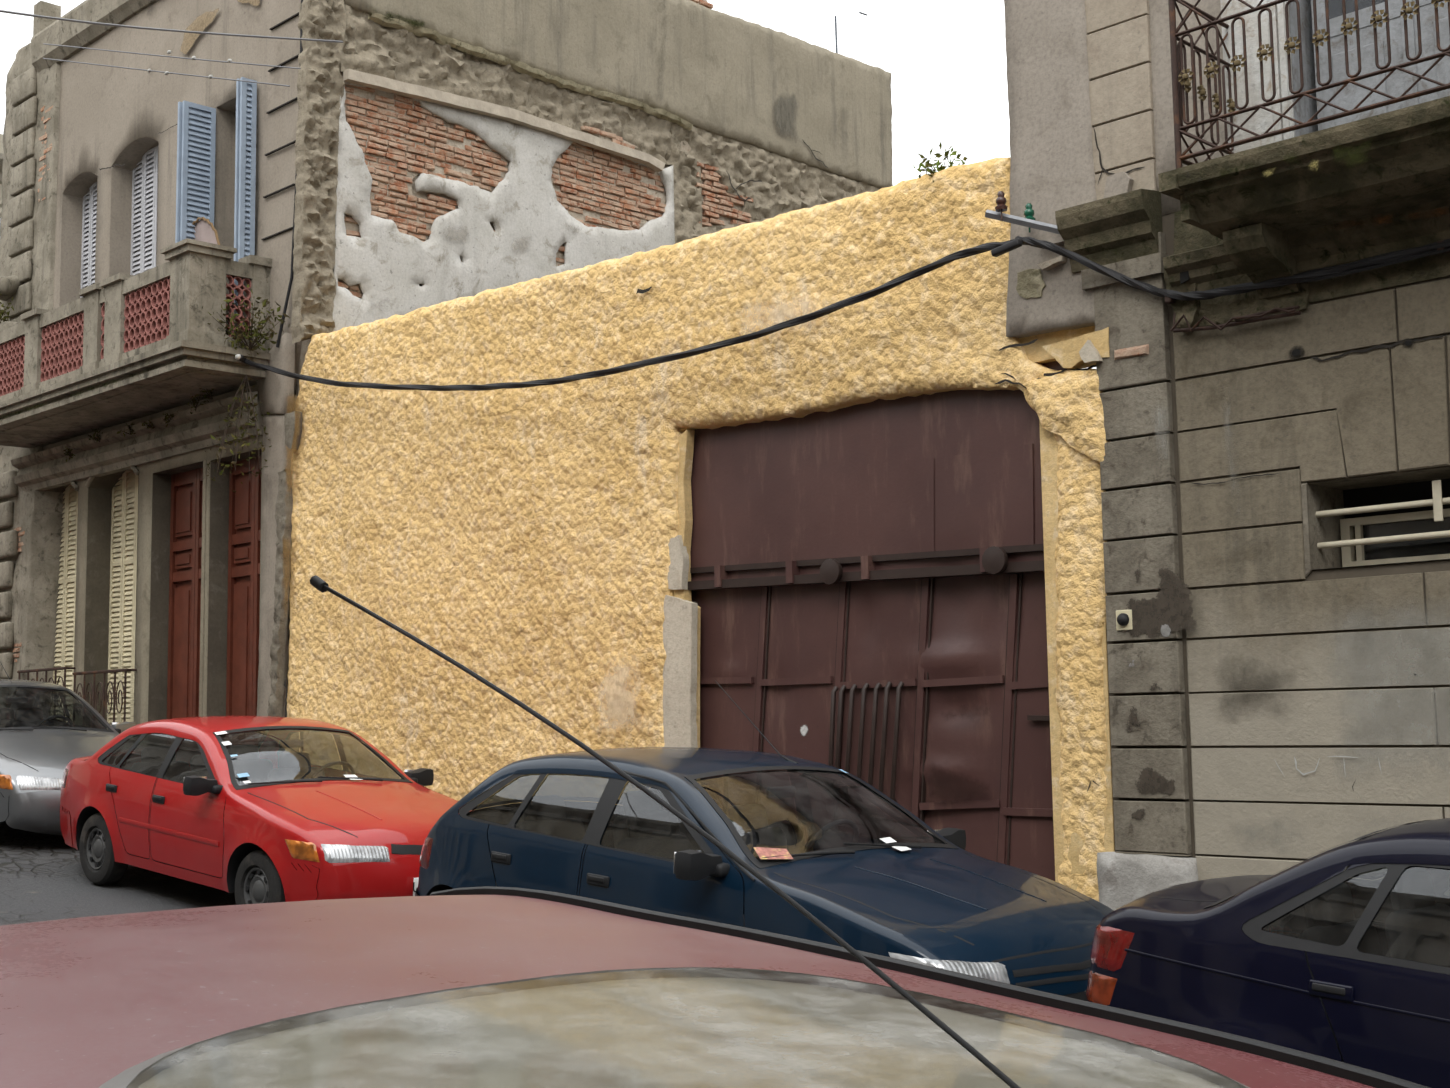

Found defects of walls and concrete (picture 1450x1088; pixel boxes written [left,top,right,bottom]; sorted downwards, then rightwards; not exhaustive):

leakage [775,95,797,135]
flaking render [290,0,880,344]
peeling [1042,327,1149,369]